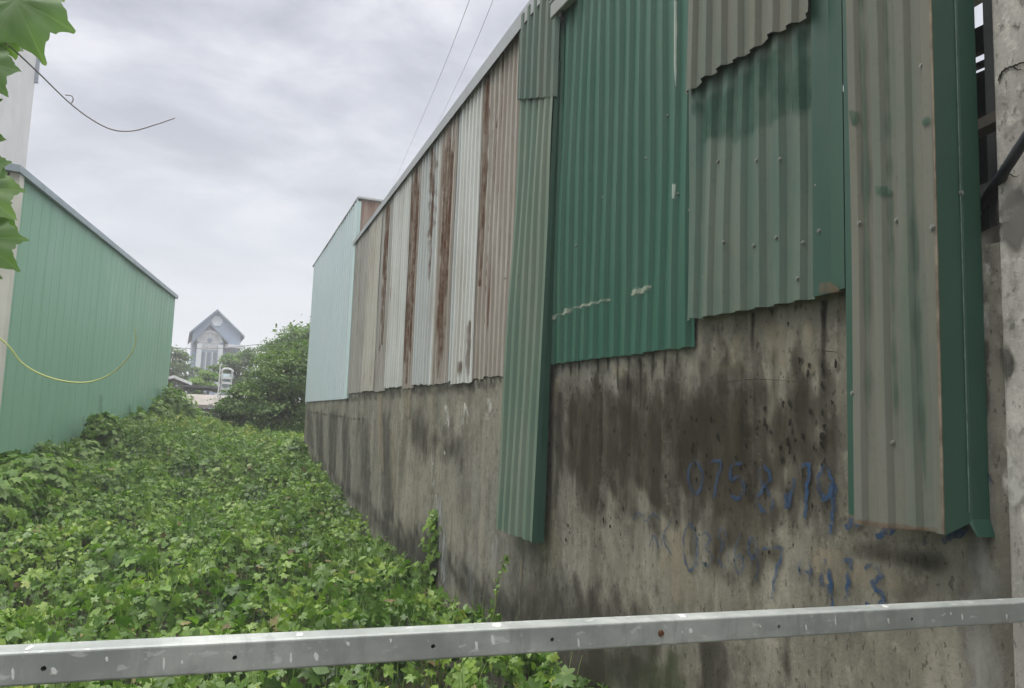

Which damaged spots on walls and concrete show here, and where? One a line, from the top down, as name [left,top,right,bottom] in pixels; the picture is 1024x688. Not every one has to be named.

rust [404,125,454,383]
rust [457,321,471,371]
rust [478,77,498,286]
damp [783,301,837,390]
damp [355,387,619,621]
damp [540,354,834,601]
damp [558,646,655,688]